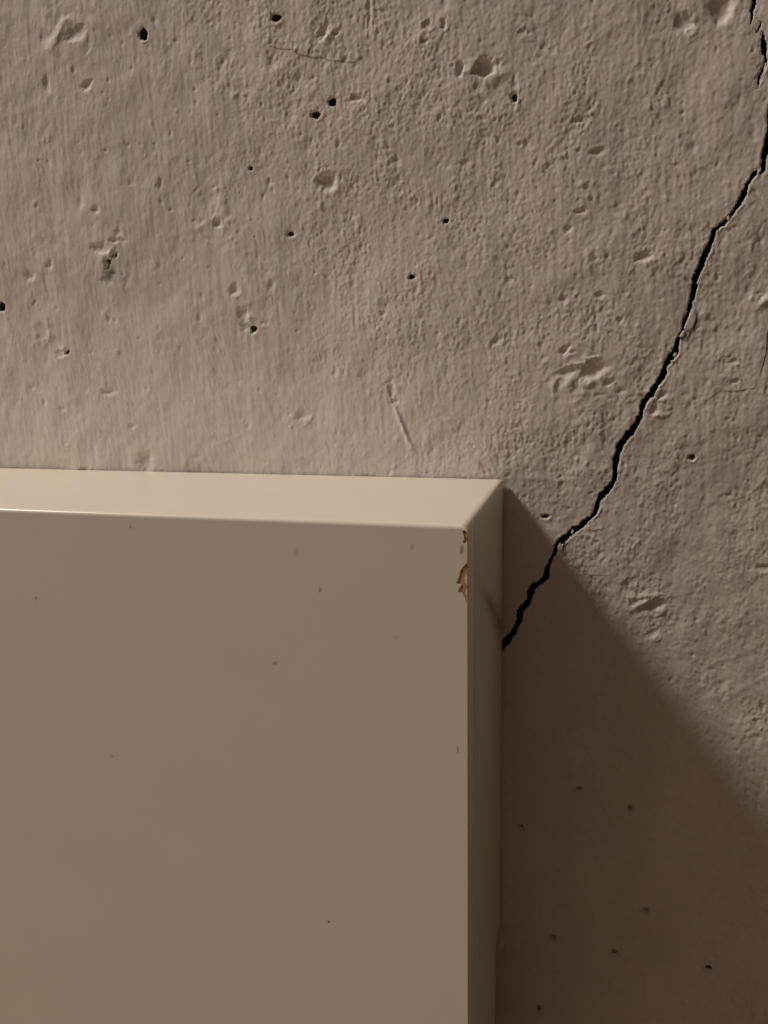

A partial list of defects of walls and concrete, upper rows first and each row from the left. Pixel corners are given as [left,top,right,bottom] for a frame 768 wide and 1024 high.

crack [502,0,768,656]